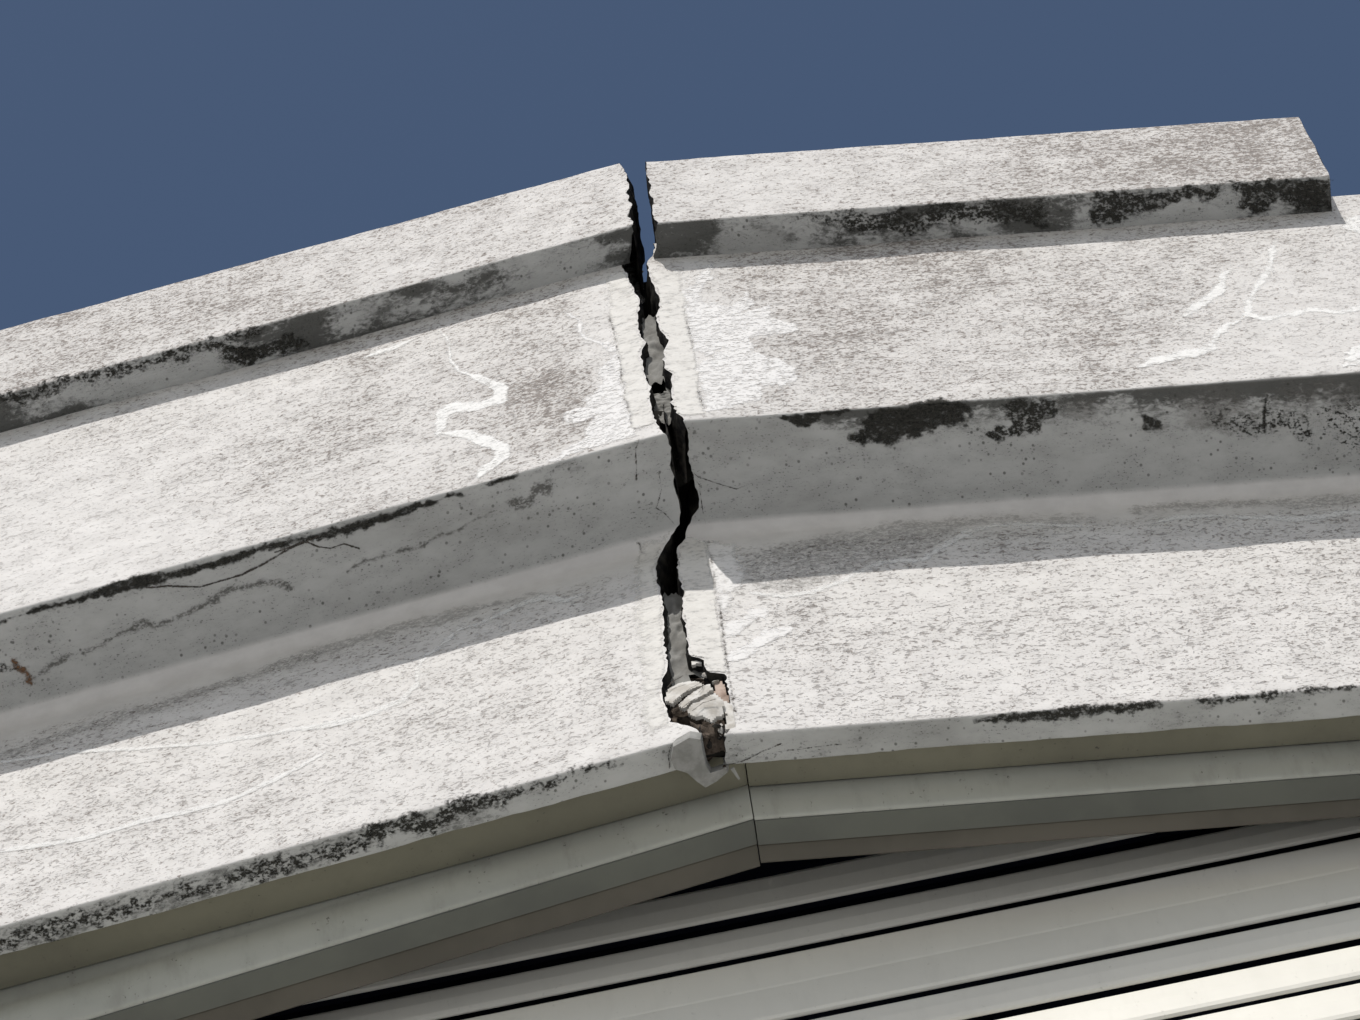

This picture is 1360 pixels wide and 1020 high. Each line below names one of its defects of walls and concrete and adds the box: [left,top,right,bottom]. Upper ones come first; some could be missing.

damp [803,197,1049,236]
damp [1089,178,1332,227]
damp [434,330,516,486]
damp [780,408,850,428]
damp [847,397,976,447]
crack [609,246,838,765]
damp [26,493,463,614]
crack [147,536,360,588]
spalling [662,661,740,788]
damp [974,700,1162,723]
damp [1198,685,1357,707]
damp [0,751,609,953]